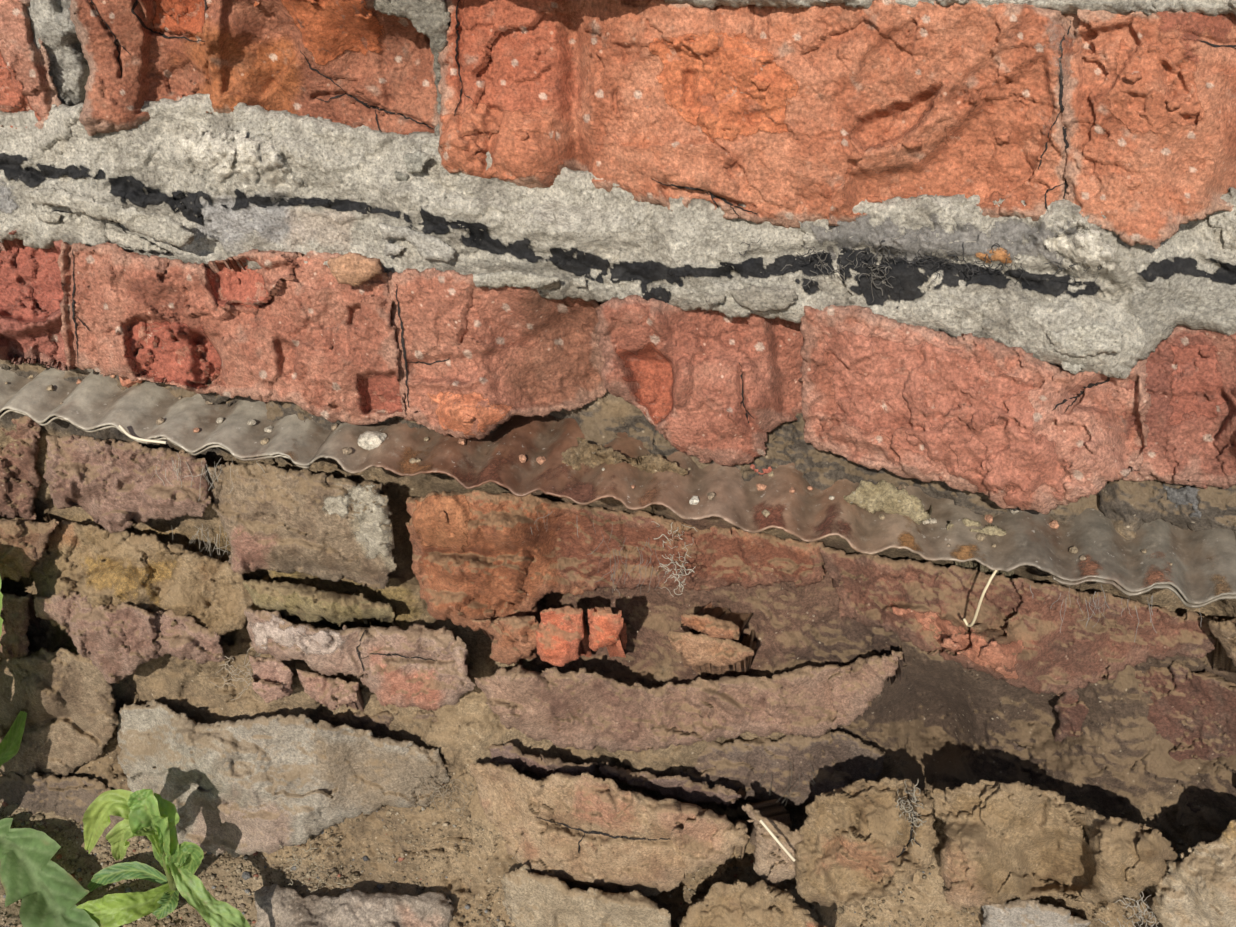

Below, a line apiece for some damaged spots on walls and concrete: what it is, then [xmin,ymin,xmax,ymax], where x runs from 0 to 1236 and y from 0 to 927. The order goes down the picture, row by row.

crack [91,0,207,77]
spalling [394,103,564,182]
spalling [649,28,799,143]
spalling [842,58,1054,217]
crack [1038,20,1071,211]
crack [651,178,757,216]
peeling [473,270,587,291]
spalling [124,317,222,389]
spalling [821,326,1035,466]
rust [754,503,785,529]
rust [816,505,851,538]
rust [1079,555,1101,576]